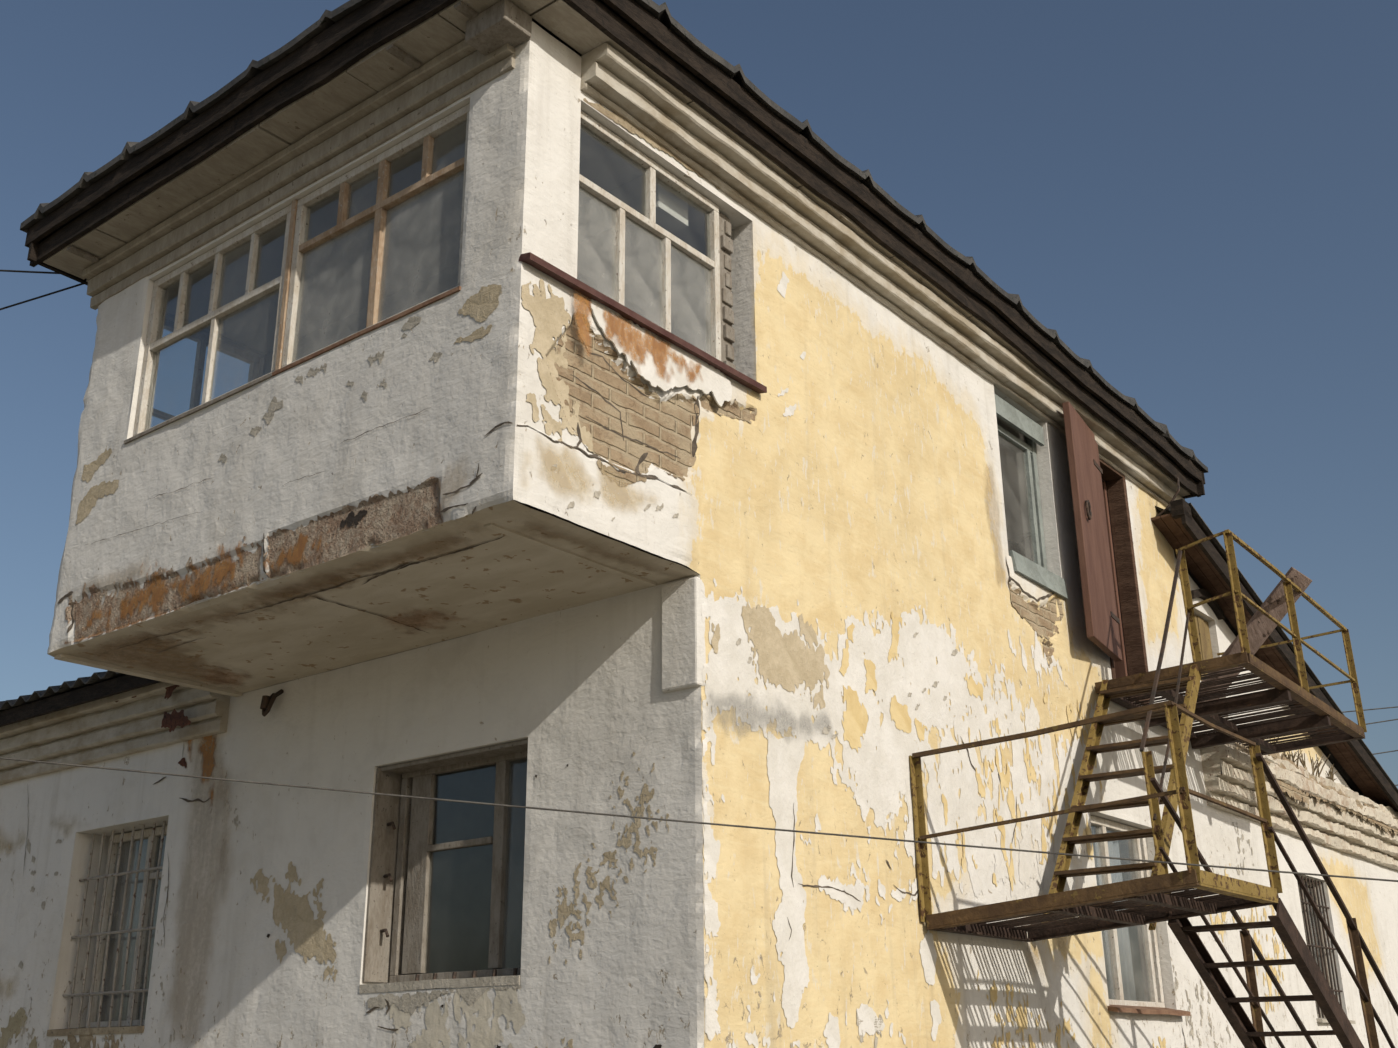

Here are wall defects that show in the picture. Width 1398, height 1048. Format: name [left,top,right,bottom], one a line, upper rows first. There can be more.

peeling [429,284,502,362]
peeling [250,396,283,436]
peeling [346,351,387,401]
flaking render [521,279,757,499]
peeling [76,448,119,525]
spalling [65,476,443,643]
flaking render [161,685,191,732]
peeling [701,578,1117,1048]
peeling [549,752,669,964]
peeling [250,861,338,982]
peeling [0,1007,123,1048]
peeling [367,984,525,1048]